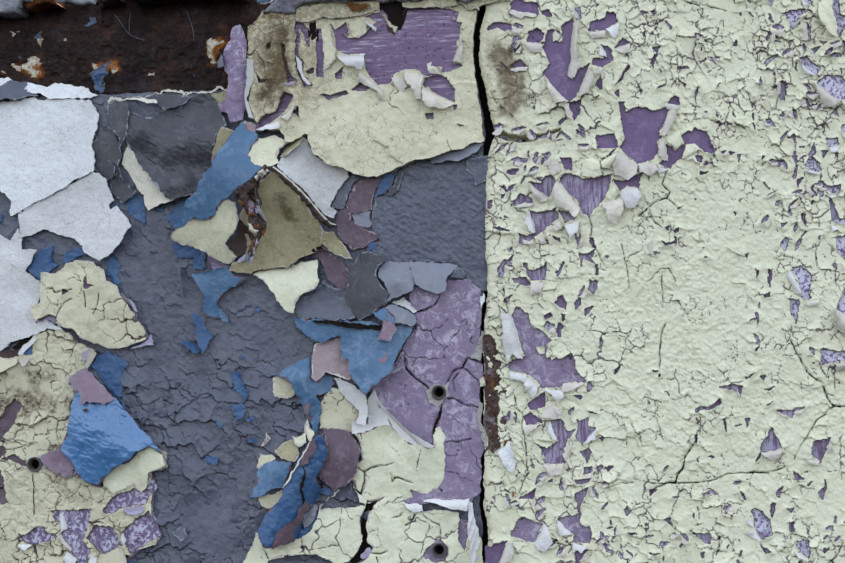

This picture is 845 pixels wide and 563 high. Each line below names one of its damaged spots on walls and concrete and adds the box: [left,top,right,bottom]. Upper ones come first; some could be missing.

corrosion [207,38,229,60]
crack [473,5,527,156]
peeling [771,0,845,116]
peeling [496,67,714,315]
peeling [791,125,845,257]
crack [482,288,507,331]
corrosion [483,334,508,453]
crack [789,340,845,439]
crack [433,352,488,563]
crack [651,417,795,492]
peeling [807,438,832,466]
peeling [745,502,775,554]